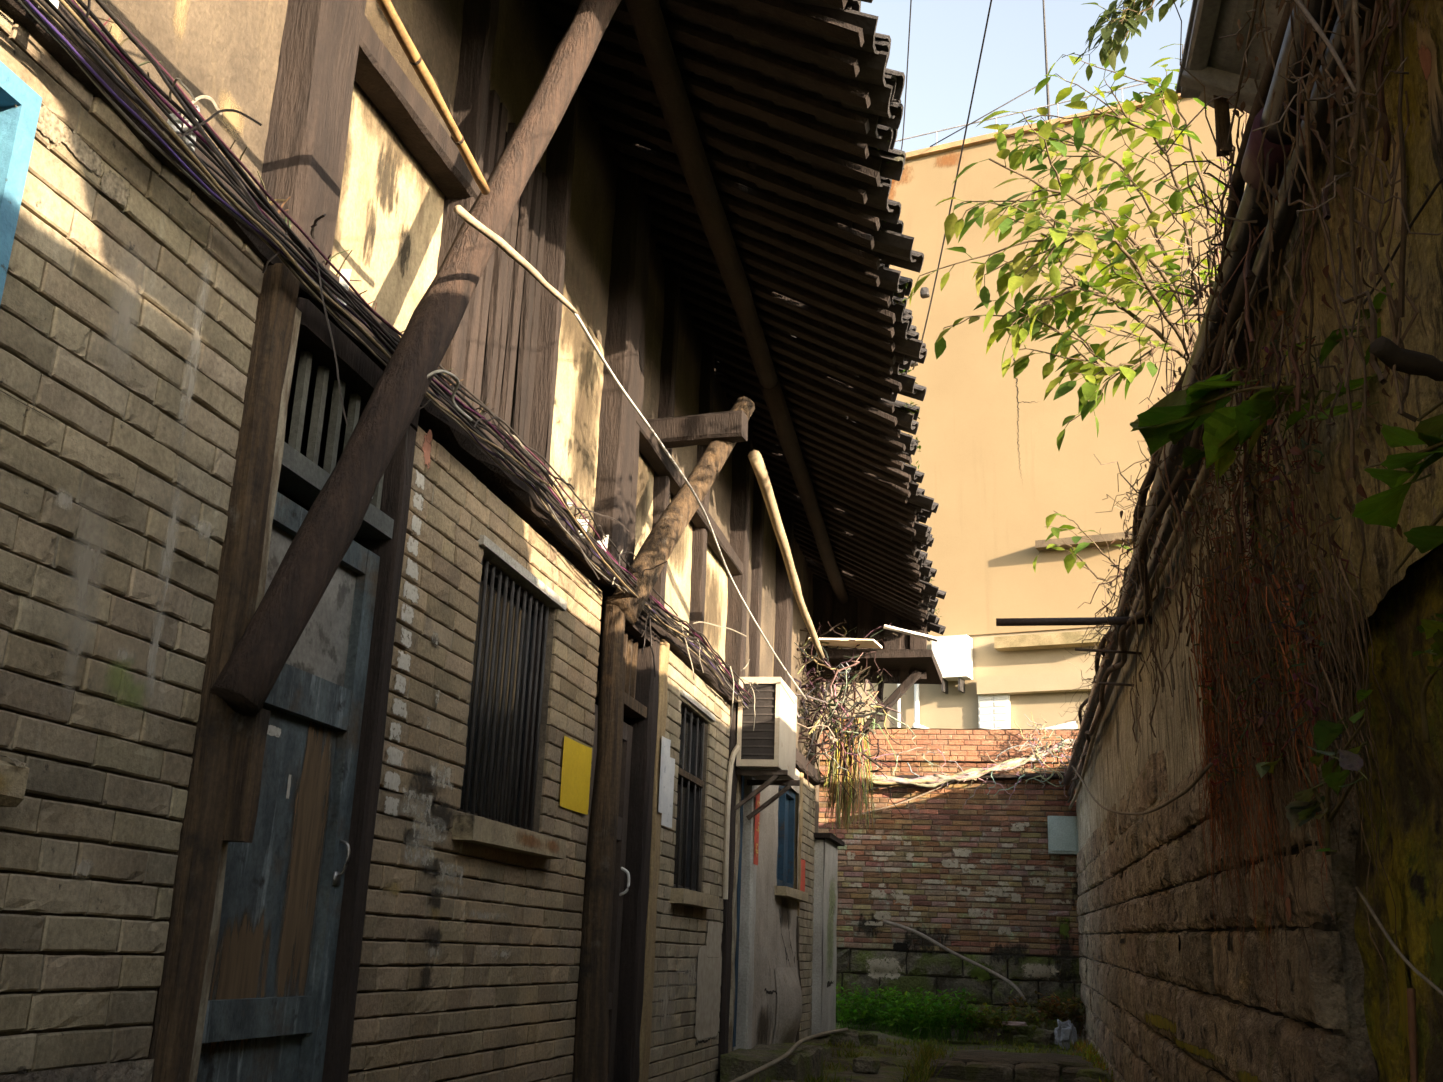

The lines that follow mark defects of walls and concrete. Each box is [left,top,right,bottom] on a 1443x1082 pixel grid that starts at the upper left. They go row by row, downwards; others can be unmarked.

water stain [363,146,400,265]
water stain [398,225,411,277]
peeling [384,429,463,883]
peeling [209,721,332,1000]